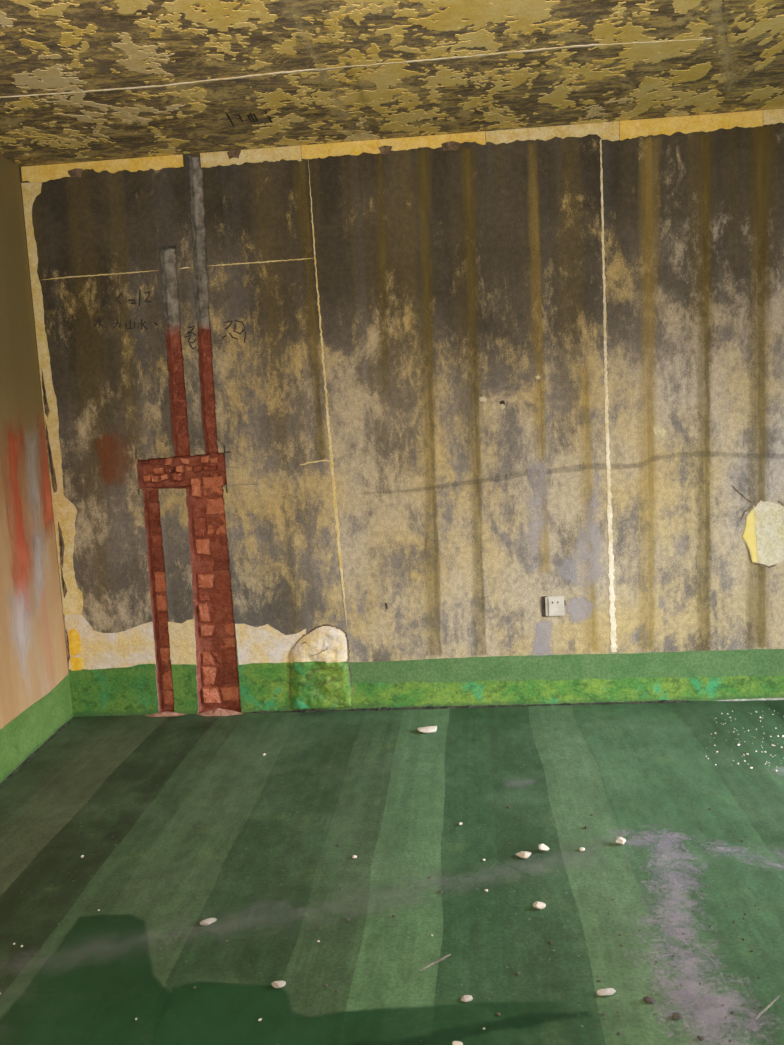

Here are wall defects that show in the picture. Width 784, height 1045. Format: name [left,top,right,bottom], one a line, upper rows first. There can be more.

crack [0,0,733,98]
peeling [0,0,784,671]